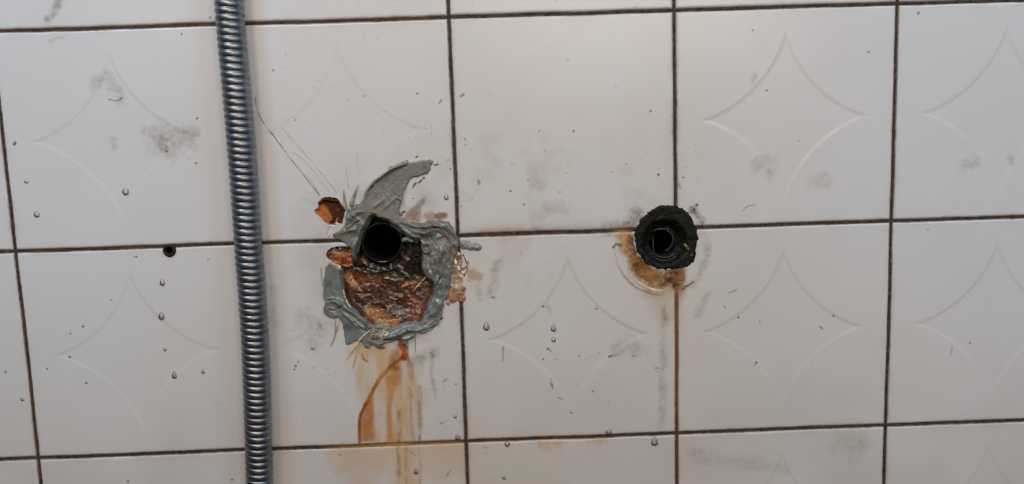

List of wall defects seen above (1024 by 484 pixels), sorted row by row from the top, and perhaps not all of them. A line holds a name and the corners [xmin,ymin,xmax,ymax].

spalling [313,197,434,326]
corrosion [619,232,684,290]
corrosion [358,339,408,444]